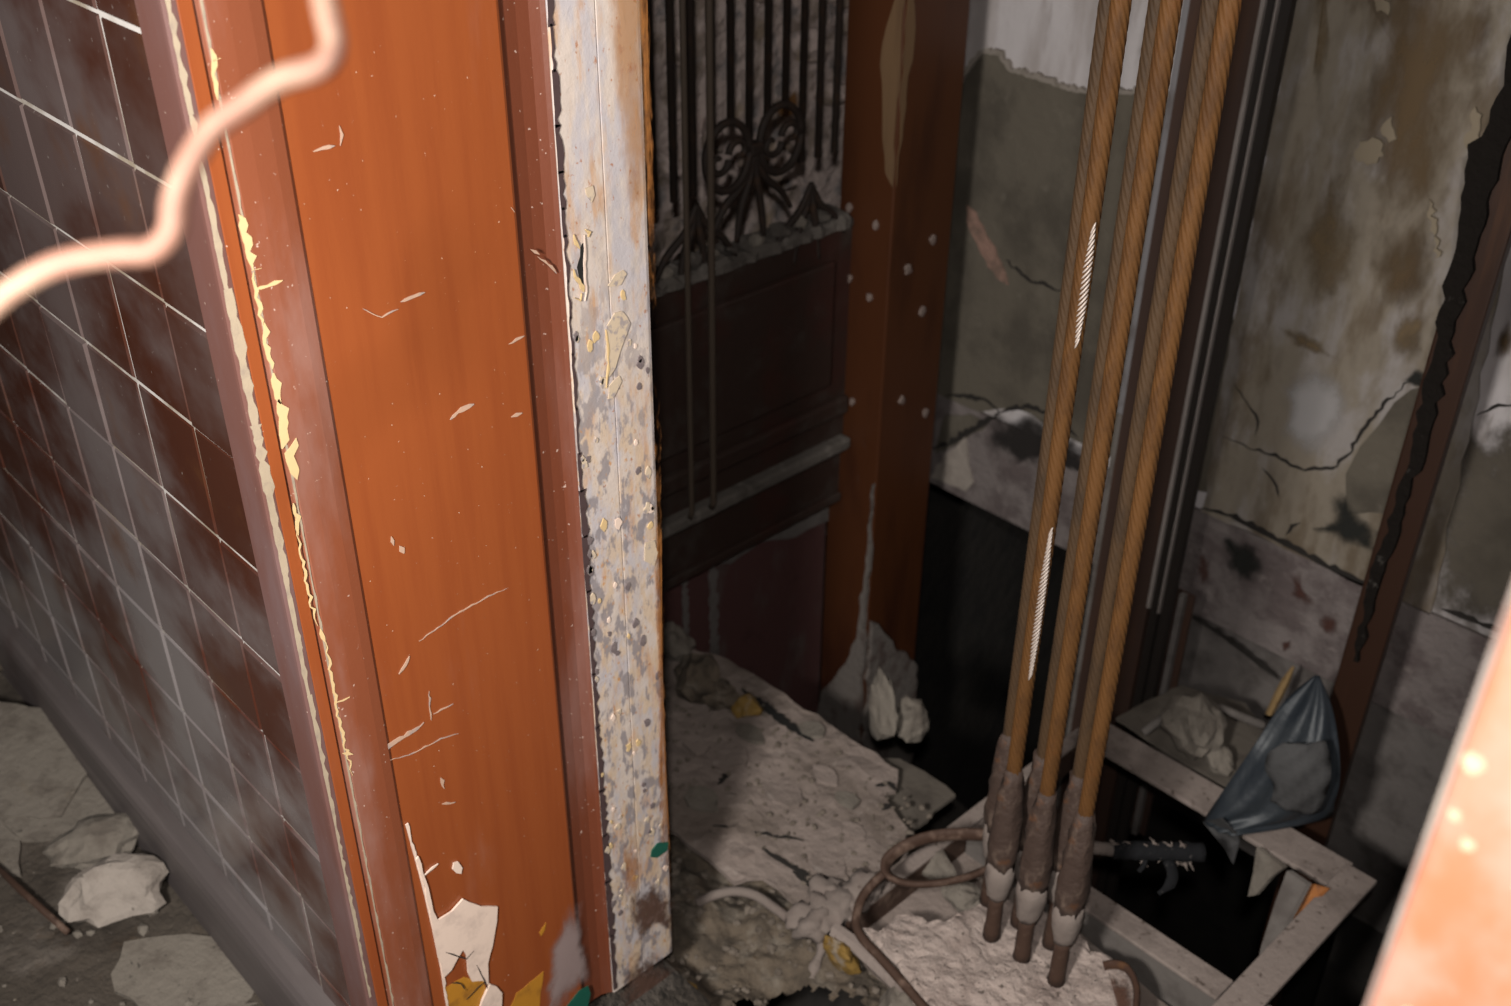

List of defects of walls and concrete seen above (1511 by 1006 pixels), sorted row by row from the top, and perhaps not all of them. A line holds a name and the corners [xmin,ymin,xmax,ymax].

peeling [165,0,197,130]
peeling [200,0,222,103]
corrosion [616,0,652,180]
water stain [1367,0,1488,196]
water stain [1385,234,1423,298]
water stain [1395,319,1423,352]
water stain [1407,372,1422,386]
peeling [201,134,394,1006]
peeling [547,0,669,990]
crack [1201,381,1409,584]
crack [1441,609,1498,632]
peeling [405,823,544,1006]